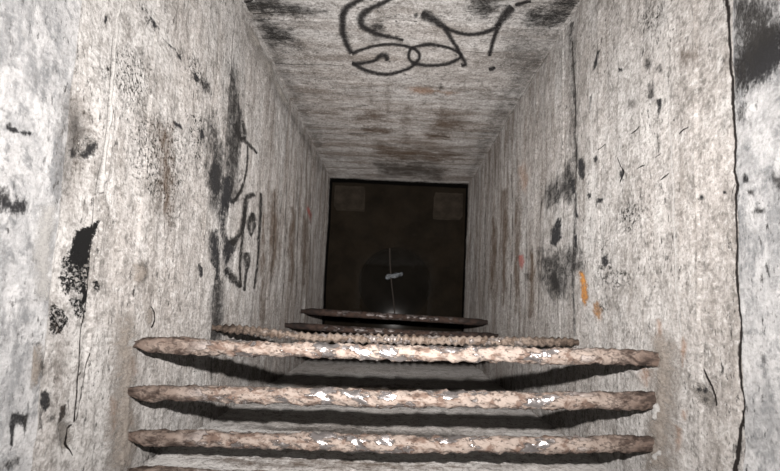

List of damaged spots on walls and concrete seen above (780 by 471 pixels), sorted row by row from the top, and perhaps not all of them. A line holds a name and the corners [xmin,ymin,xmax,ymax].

crack [73,197,94,422]
corrosion [578,272,601,319]
crack [725,0,746,471]